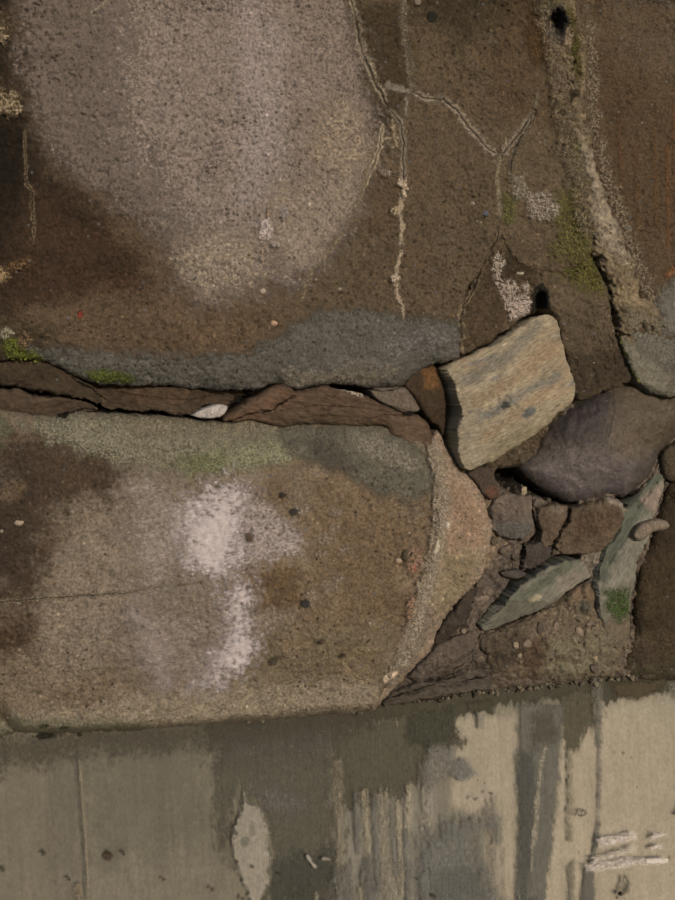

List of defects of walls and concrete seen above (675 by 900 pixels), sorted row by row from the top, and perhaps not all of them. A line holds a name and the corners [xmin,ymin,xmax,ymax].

crack [348,0,539,354]
efflorescence [492,253,533,321]
efflorescence [508,173,560,221]
leakage [111,468,309,700]
leakage [0,677,675,900]